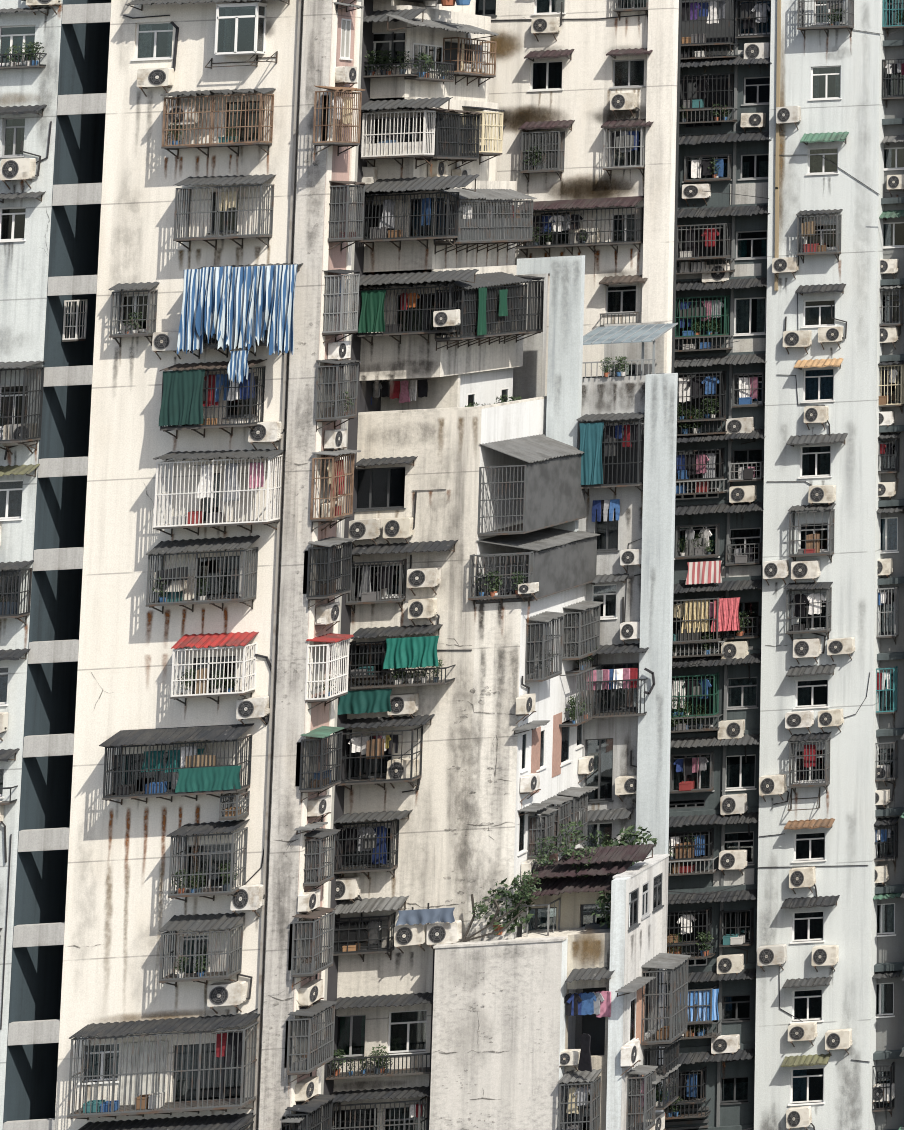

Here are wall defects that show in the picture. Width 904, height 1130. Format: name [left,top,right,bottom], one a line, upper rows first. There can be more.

water stain [490,37,516,55]
corrosion [147,609,186,636]
corrosion [109,811,130,861]
corrosion [162,806,200,866]